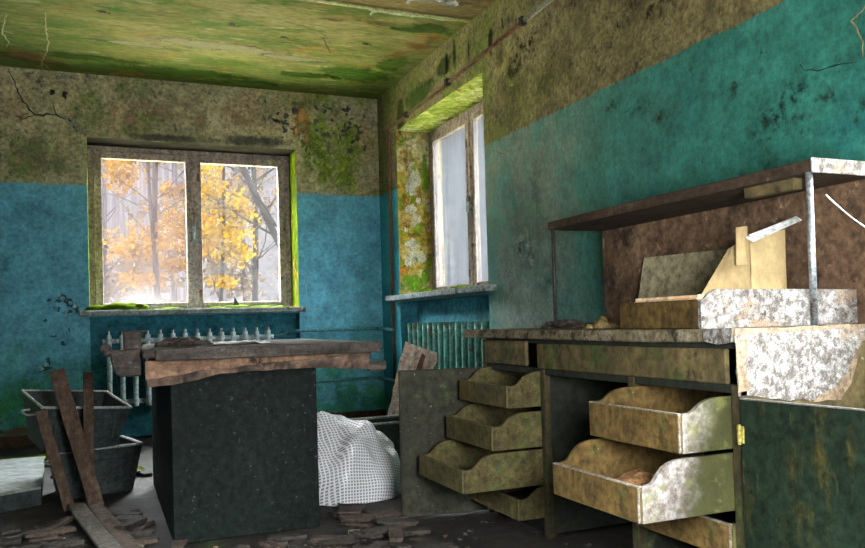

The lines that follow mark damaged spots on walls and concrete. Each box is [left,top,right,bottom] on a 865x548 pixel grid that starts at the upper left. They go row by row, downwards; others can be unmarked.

peeling [370,0,451,21]
crack [38,12,50,70]
damp [97,37,327,62]
crack [8,68,85,135]
peeling [47,294,79,315]